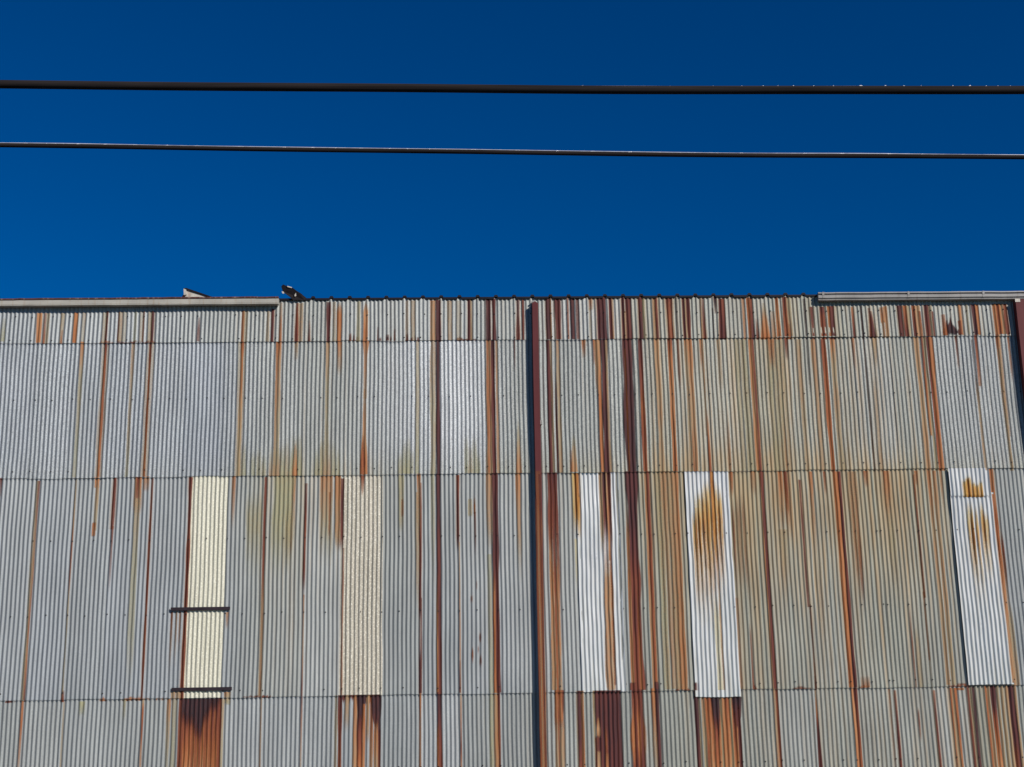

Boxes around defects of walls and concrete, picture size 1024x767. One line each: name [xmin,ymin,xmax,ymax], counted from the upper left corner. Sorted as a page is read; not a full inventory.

corrosion [92,311,230,767]
corrosion [321,299,501,767]
corrosion [537,297,746,767]
corrosion [737,297,870,767]
corrosion [868,304,1024,767]